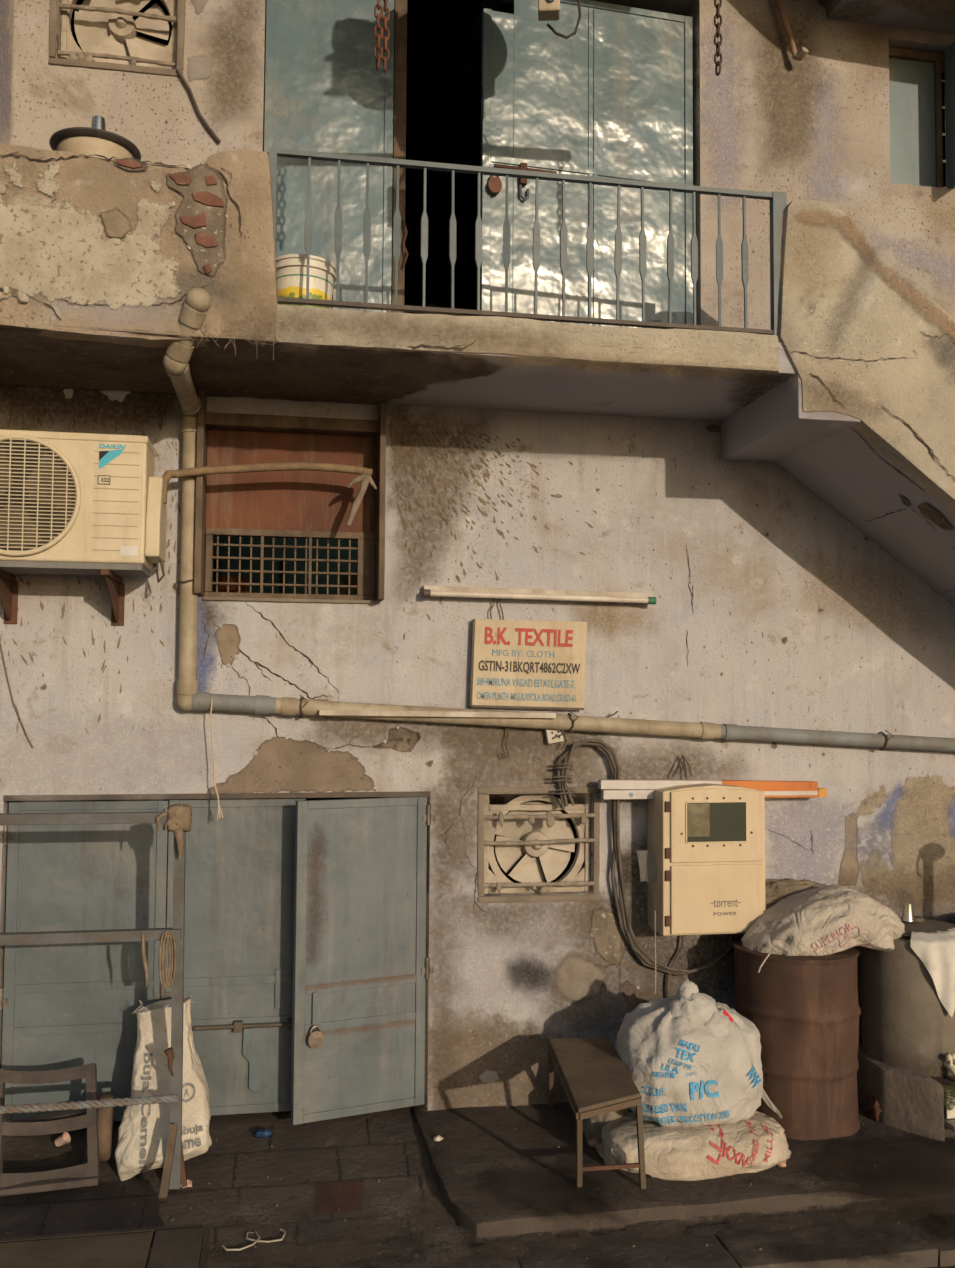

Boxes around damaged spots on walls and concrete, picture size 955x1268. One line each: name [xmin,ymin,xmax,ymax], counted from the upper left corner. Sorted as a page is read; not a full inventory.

peeling [0,158,228,310]
damp [0,318,597,640]
crack [771,331,955,547]
crack [202,603,339,735]
peeling [207,735,376,795]
peeling [368,726,421,752]
peeling [838,812,860,886]